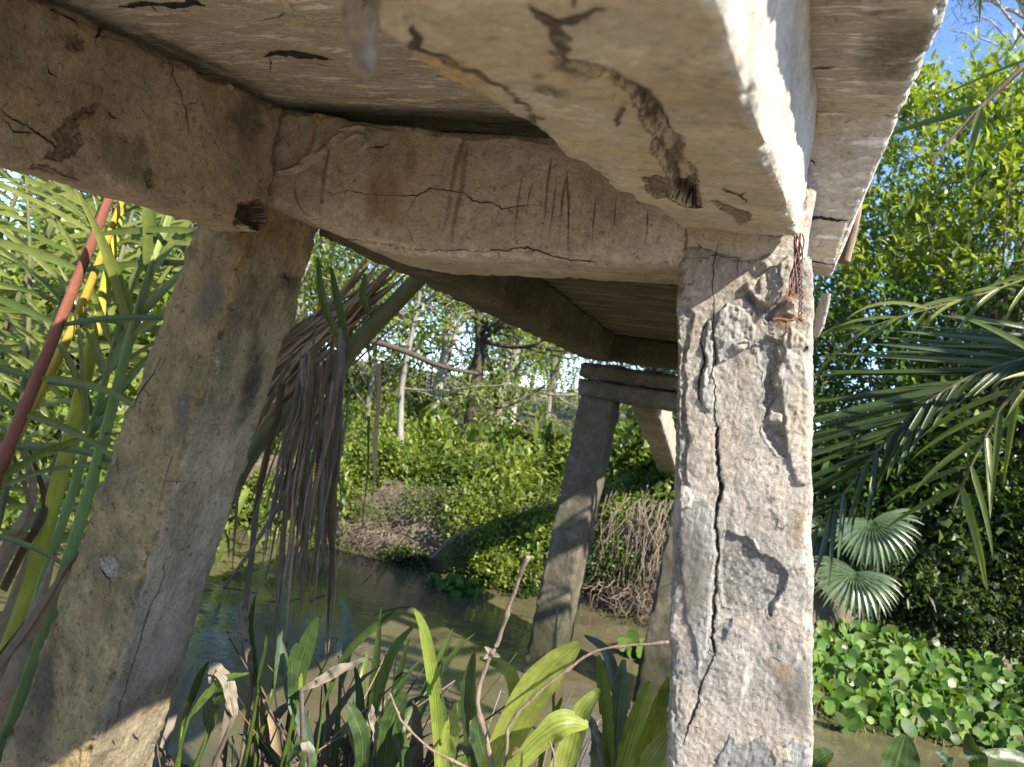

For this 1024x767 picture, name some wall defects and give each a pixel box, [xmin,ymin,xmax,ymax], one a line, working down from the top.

crack [118,0,205,14]
crack [528,0,606,58]
crack [264,51,331,71]
crack [407,26,545,126]
crack [1,110,56,154]
crack [613,108,626,127]
spalling [231,199,267,234]
crack [332,188,593,262]
spalling [675,255,831,670]
crack [680,240,739,750]
crack [112,563,165,745]